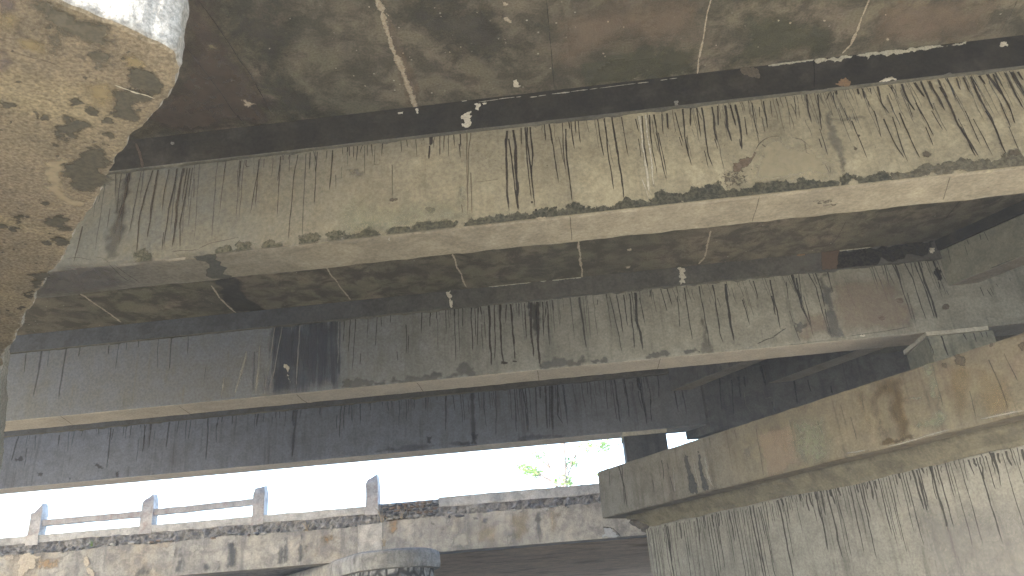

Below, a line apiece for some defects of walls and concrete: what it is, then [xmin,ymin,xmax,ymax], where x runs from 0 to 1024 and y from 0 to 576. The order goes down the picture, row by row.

leakage [143,1,319,145]
leakage [212,144,383,237]
leakage [401,133,472,212]
peeling [461,103,486,128]
leakage [505,71,1024,211]
leakage [195,254,264,313]
leakage [421,241,951,365]
leakage [221,315,391,397]
leakage [509,377,659,432]
corrosion [879,381,912,445]
leakage [647,448,1024,576]